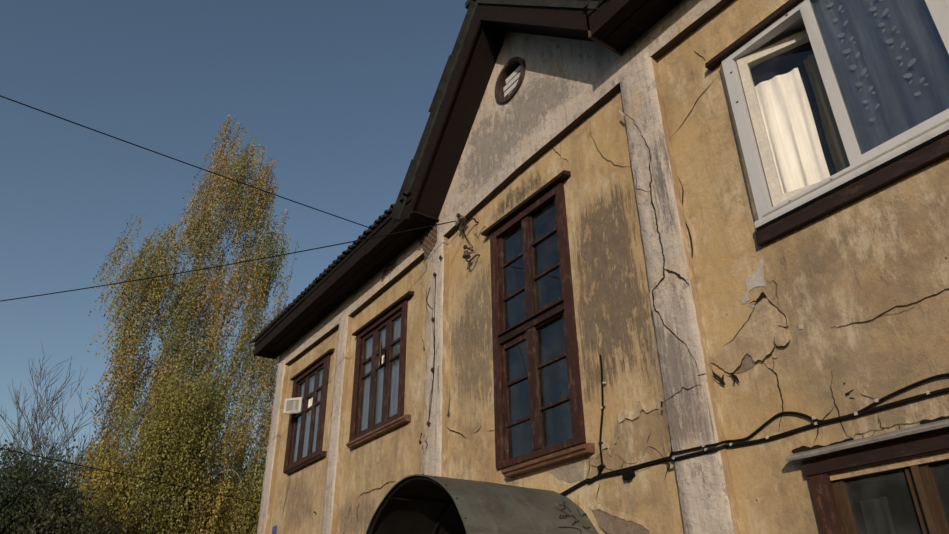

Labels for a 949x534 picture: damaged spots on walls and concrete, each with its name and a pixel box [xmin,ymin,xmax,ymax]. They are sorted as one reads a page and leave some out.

damp [573,186,714,449]
crack [591,110,790,435]
peeling [741,258,766,308]
crack [834,288,949,327]
flaking render [736,355,756,374]
flaking render [547,389,672,483]
flaking render [587,501,650,534]